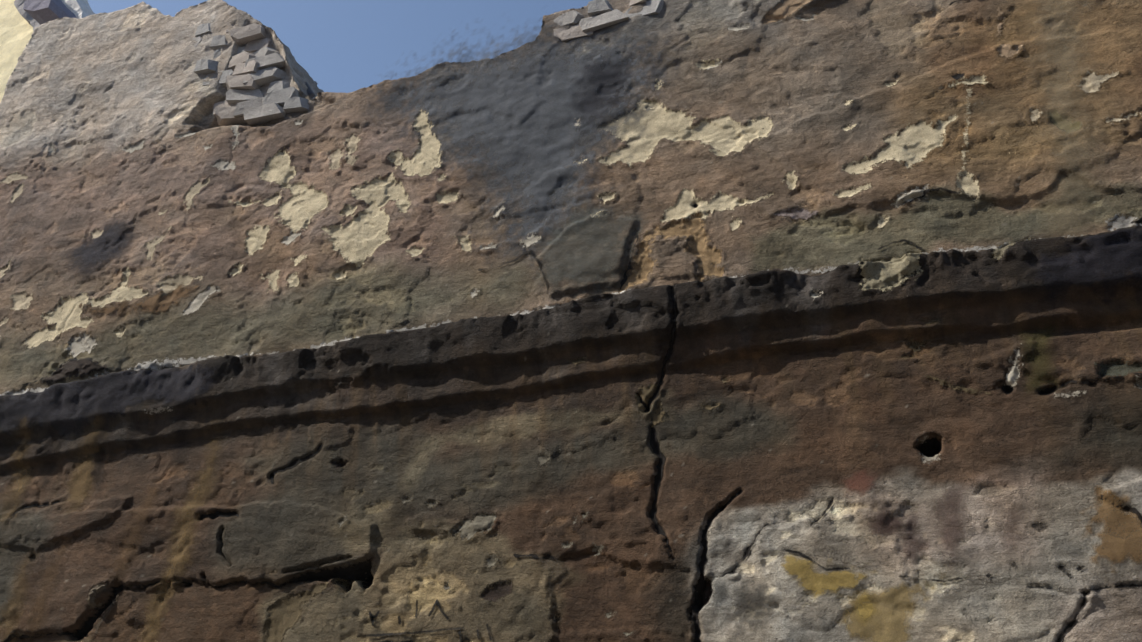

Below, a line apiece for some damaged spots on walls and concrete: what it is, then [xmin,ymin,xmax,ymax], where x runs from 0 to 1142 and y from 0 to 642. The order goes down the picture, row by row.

peeling [575,80,774,166]
peeling [833,114,957,198]
water stain [73,221,133,272]
peeling [227,109,458,293]
spalling [612,188,774,294]
spalling [856,237,1041,293]
peeling [0,266,221,396]
crack [637,285,677,555]
crack [269,444,348,484]
crack [122,559,374,594]
crack [690,490,834,642]
crack [1047,584,1142,642]